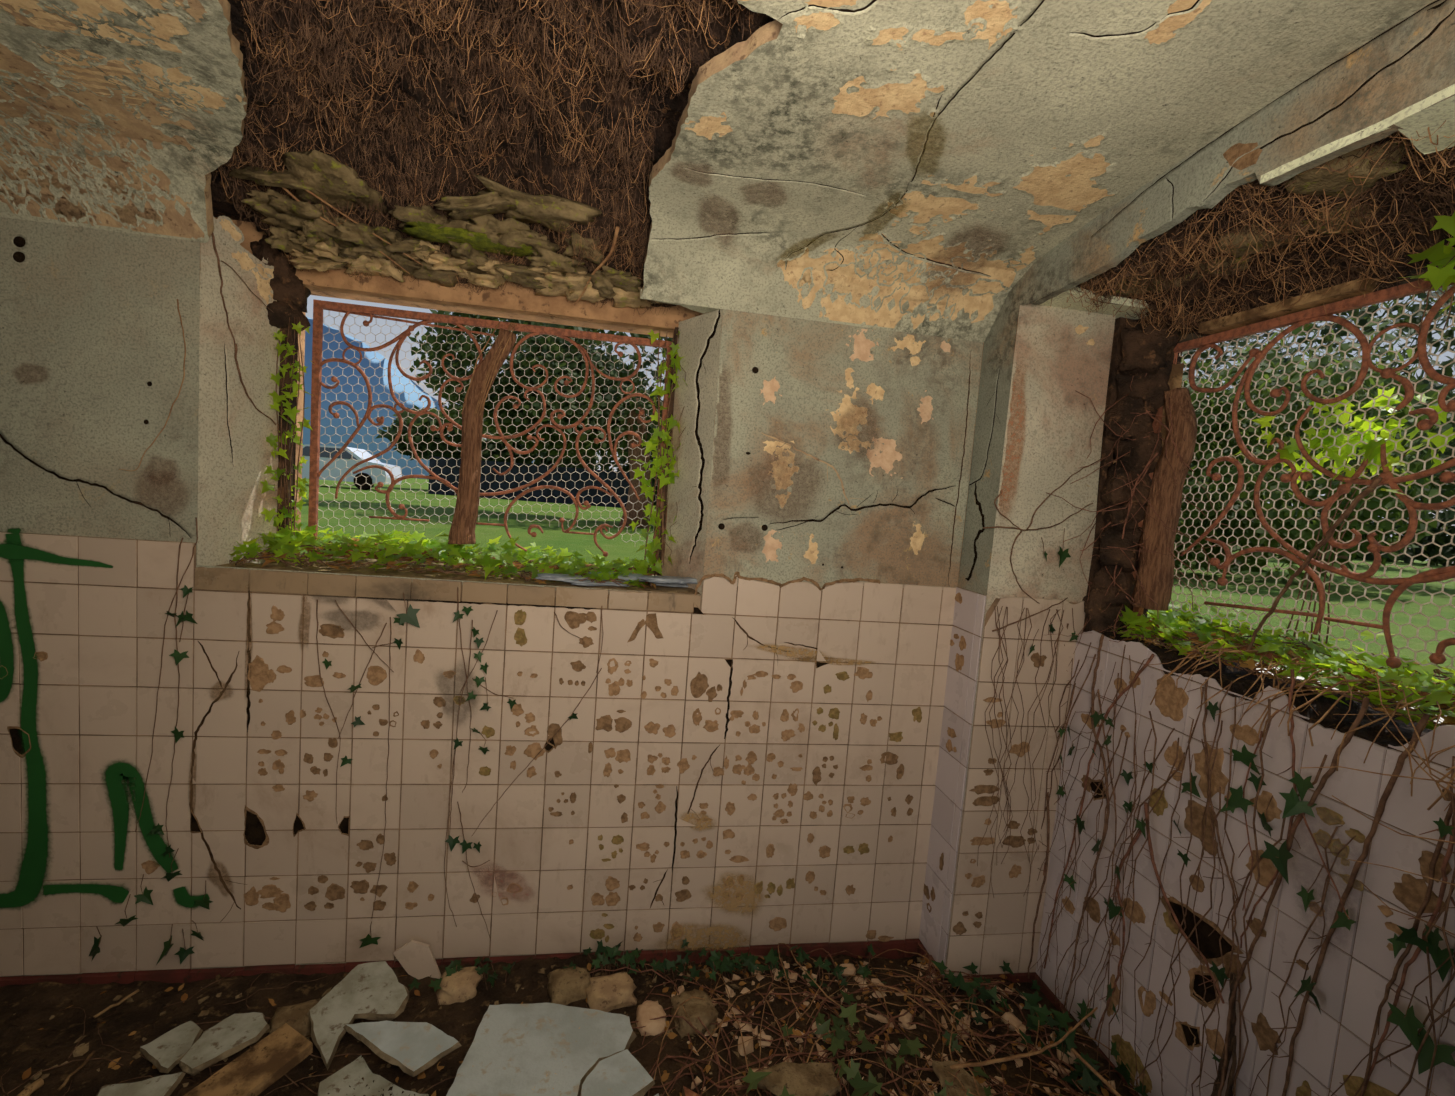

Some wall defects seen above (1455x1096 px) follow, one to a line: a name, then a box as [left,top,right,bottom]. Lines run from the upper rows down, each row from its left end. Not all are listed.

peeling [0,0,277,313]
crack [651,0,1045,277]
crack [1068,0,1203,41]
crack [1091,0,1455,240]
peeling [774,131,1120,481]
crack [0,427,195,538]
crack [687,310,1000,587]
crack [189,591,251,922]
spalling [243,805,269,849]
spalling [244,816,396,913]
spalling [588,658,922,943]
spalling [1123,874,1244,1057]